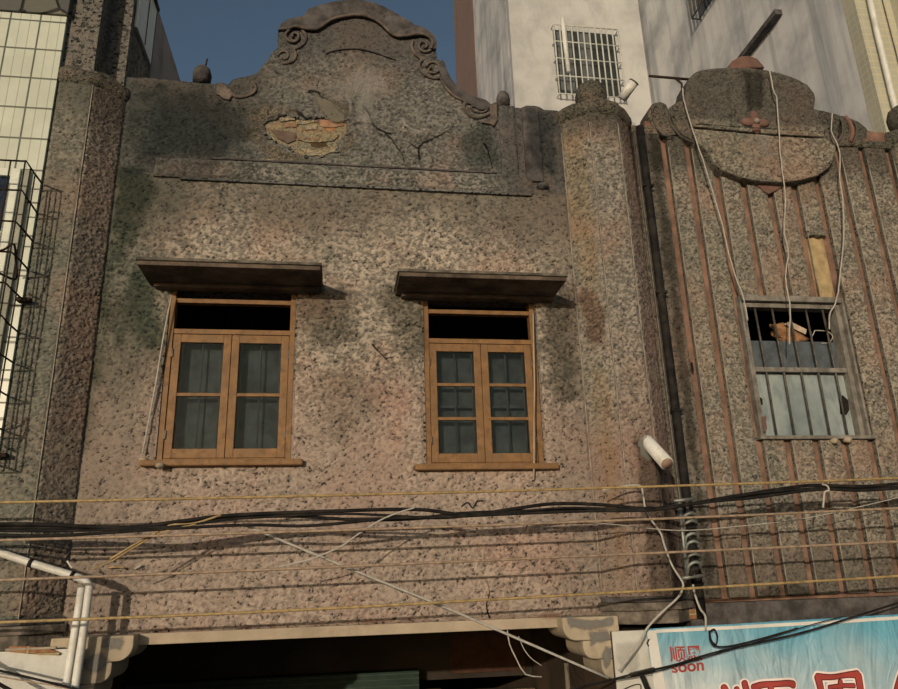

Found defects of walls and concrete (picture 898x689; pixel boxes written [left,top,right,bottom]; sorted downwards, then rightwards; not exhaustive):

spalling [249,94,352,161]
crack [354,104,449,162]